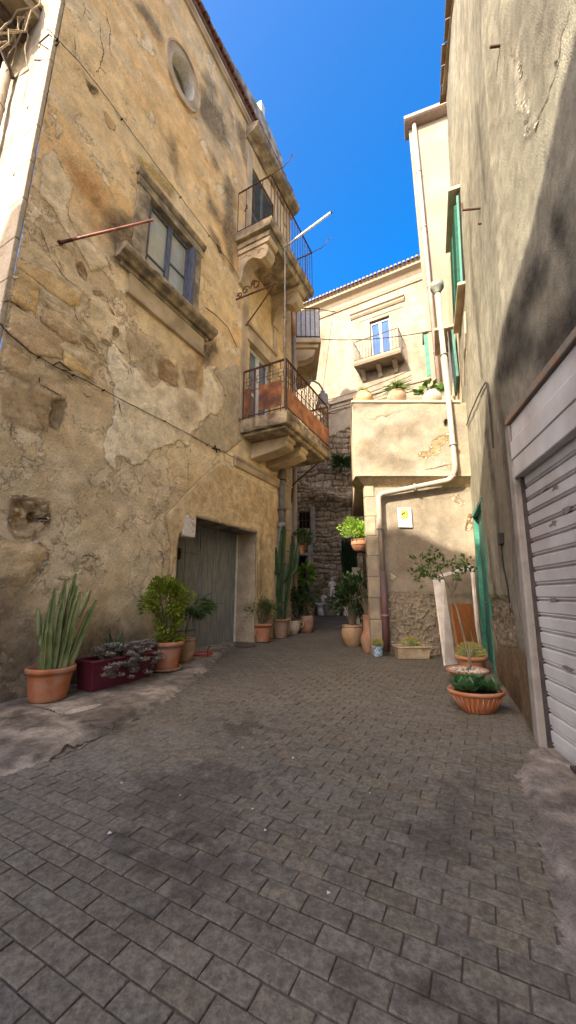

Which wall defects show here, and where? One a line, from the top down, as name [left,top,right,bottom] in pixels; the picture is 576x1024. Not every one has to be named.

crack [74,5,111,79]
crack [504,10,569,135]
flaking render [0,124,226,470]
flaking render [418,419,449,459]
flaking render [6,495,52,539]
crack [34,542,101,603]